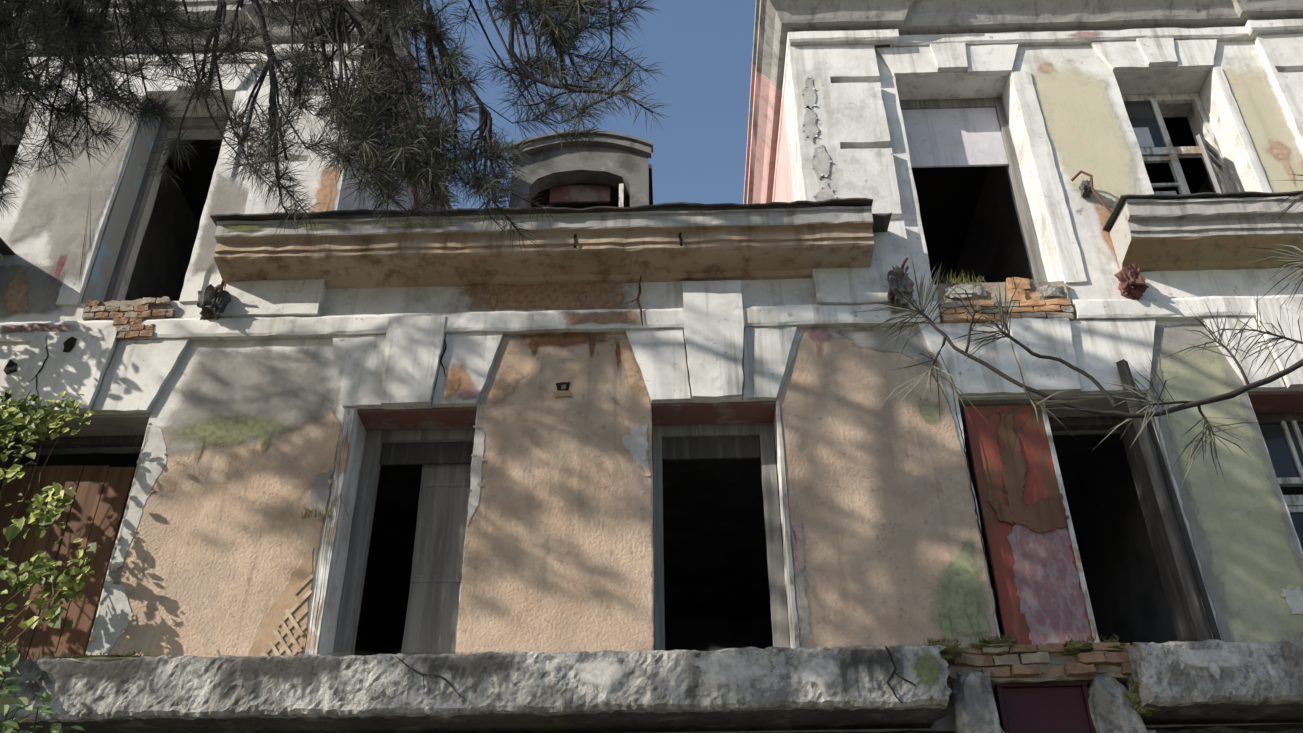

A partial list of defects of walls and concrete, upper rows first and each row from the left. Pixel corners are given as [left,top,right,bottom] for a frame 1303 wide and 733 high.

spalling [82,296,176,341]
spalling [937,277,1074,324]
spalling [63,337,77,353]
flaking render [620,424,651,477]
flaking render [467,426,485,526]
peeling [988,493,1069,534]
flaking render [86,423,168,655]
flaking render [1280,584,1303,615]
damp [31,657,160,701]
damp [220,652,339,696]
damp [407,652,513,696]
crack [885,646,917,703]